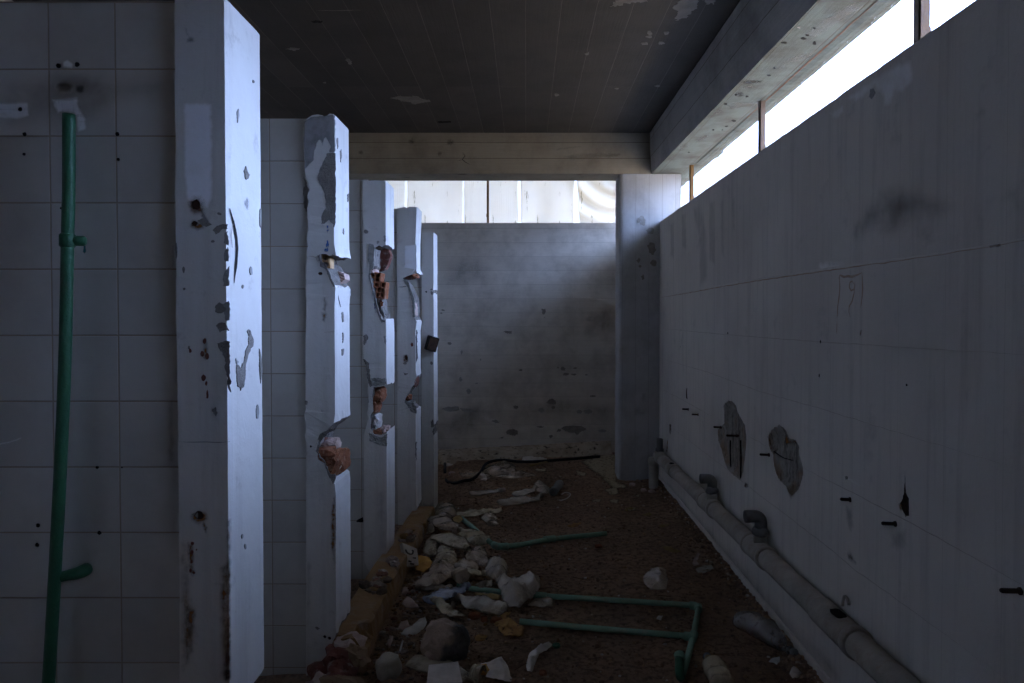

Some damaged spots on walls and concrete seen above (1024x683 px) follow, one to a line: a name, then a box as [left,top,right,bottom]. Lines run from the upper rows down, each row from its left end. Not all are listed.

peeling [303,138,349,235]
peeling [198,212,253,289]
peeling [364,230,388,323]
peeling [403,274,420,317]
peeling [215,301,263,392]
spalling [363,359,387,414]
spalling [316,428,351,484]
peeling [369,425,391,447]
spalling [718,401,747,480]
spalling [769,425,803,496]
spalling [900,484,909,517]